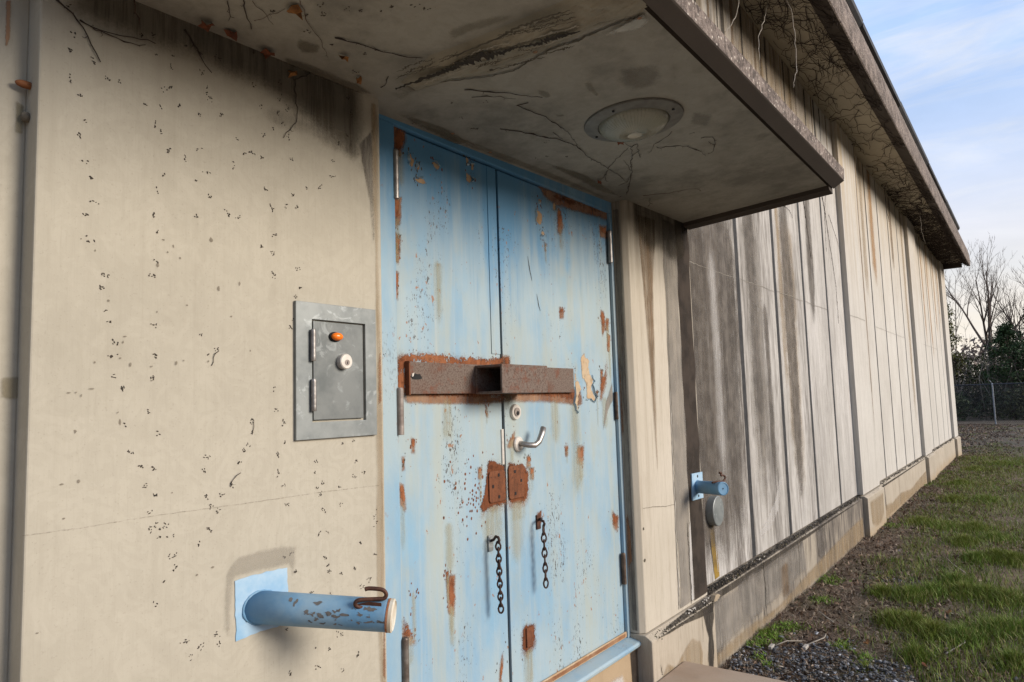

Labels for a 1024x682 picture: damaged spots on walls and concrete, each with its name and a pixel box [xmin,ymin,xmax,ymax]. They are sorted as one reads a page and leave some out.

crack [395,10,644,90]
damp [78,0,376,186]
rust [395,198,403,299]
rust [539,186,607,239]
damp [853,146,873,401]
rust [598,311,610,352]
rust [397,350,582,416]
peeling [573,354,598,414]
damp [638,207,806,667]
rust [444,451,536,541]
damp [817,528,827,557]
rust [443,561,458,615]